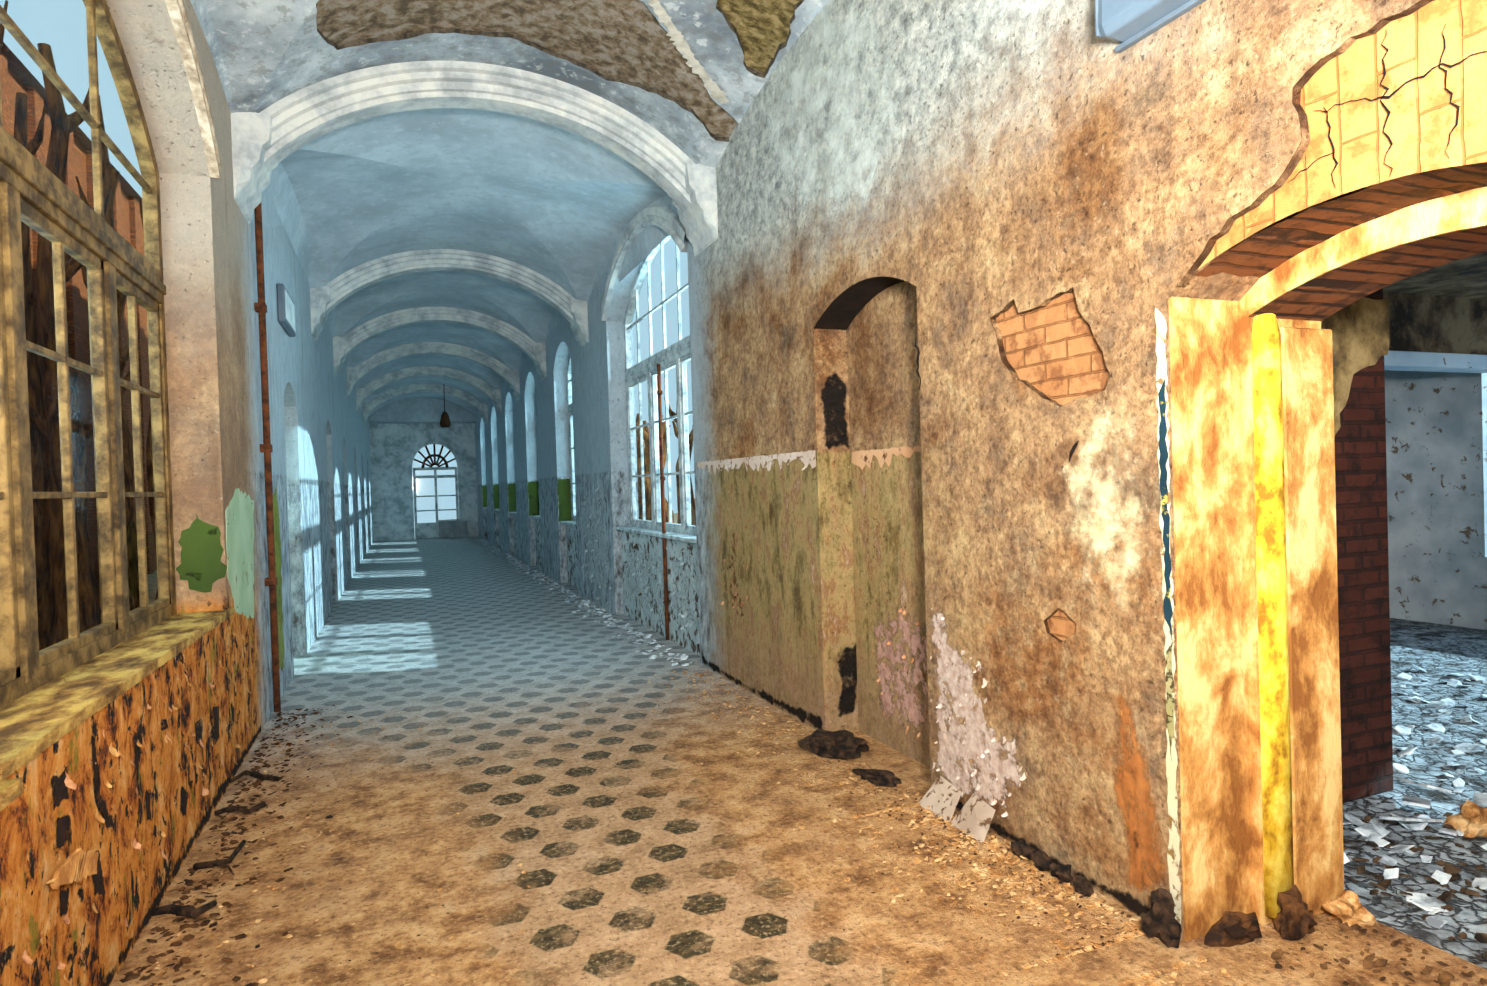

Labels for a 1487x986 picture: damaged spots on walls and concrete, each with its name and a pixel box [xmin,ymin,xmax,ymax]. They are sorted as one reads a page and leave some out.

flaking render [316,0,737,142]
flaking render [716,0,804,78]
flaking render [1176,0,1487,288]
flaking render [990,288,1110,406]
flaking render [1321,297,1389,437]
peeling [1155,308,1181,924]
peeling [41,619,260,931]
peeling [872,608,1027,817]
peeling [21,937,83,983]